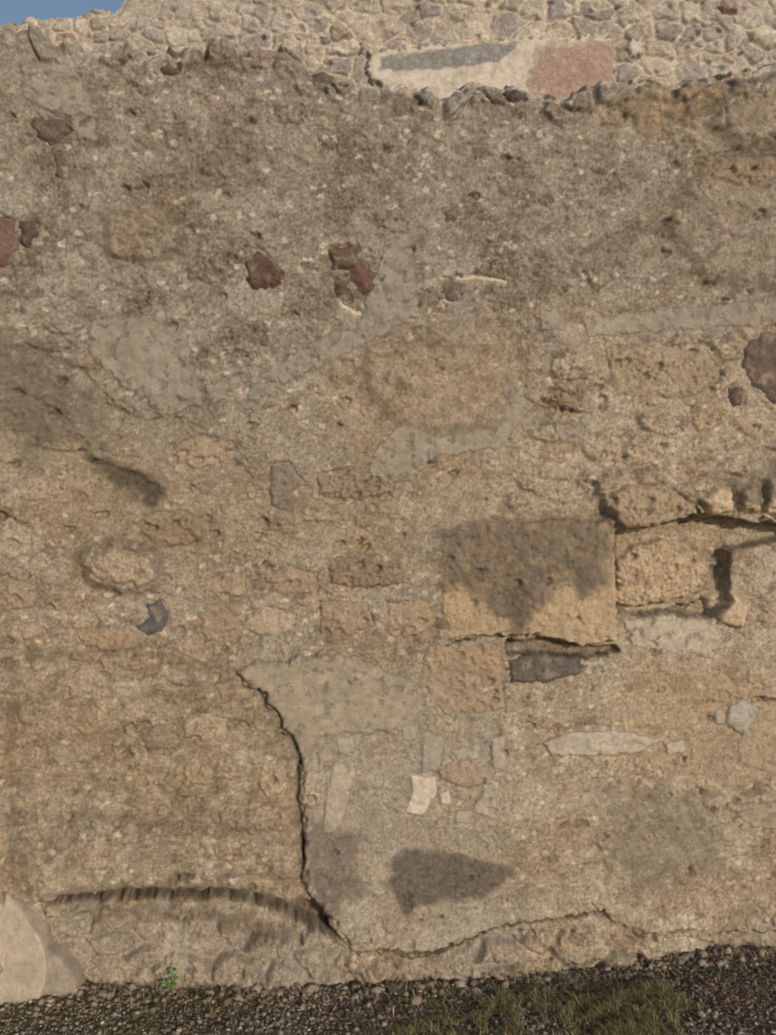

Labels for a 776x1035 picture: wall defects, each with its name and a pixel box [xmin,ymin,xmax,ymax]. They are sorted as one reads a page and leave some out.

crack [258,688,312,899]
damp [392,851,509,917]
crack [337,908,611,984]